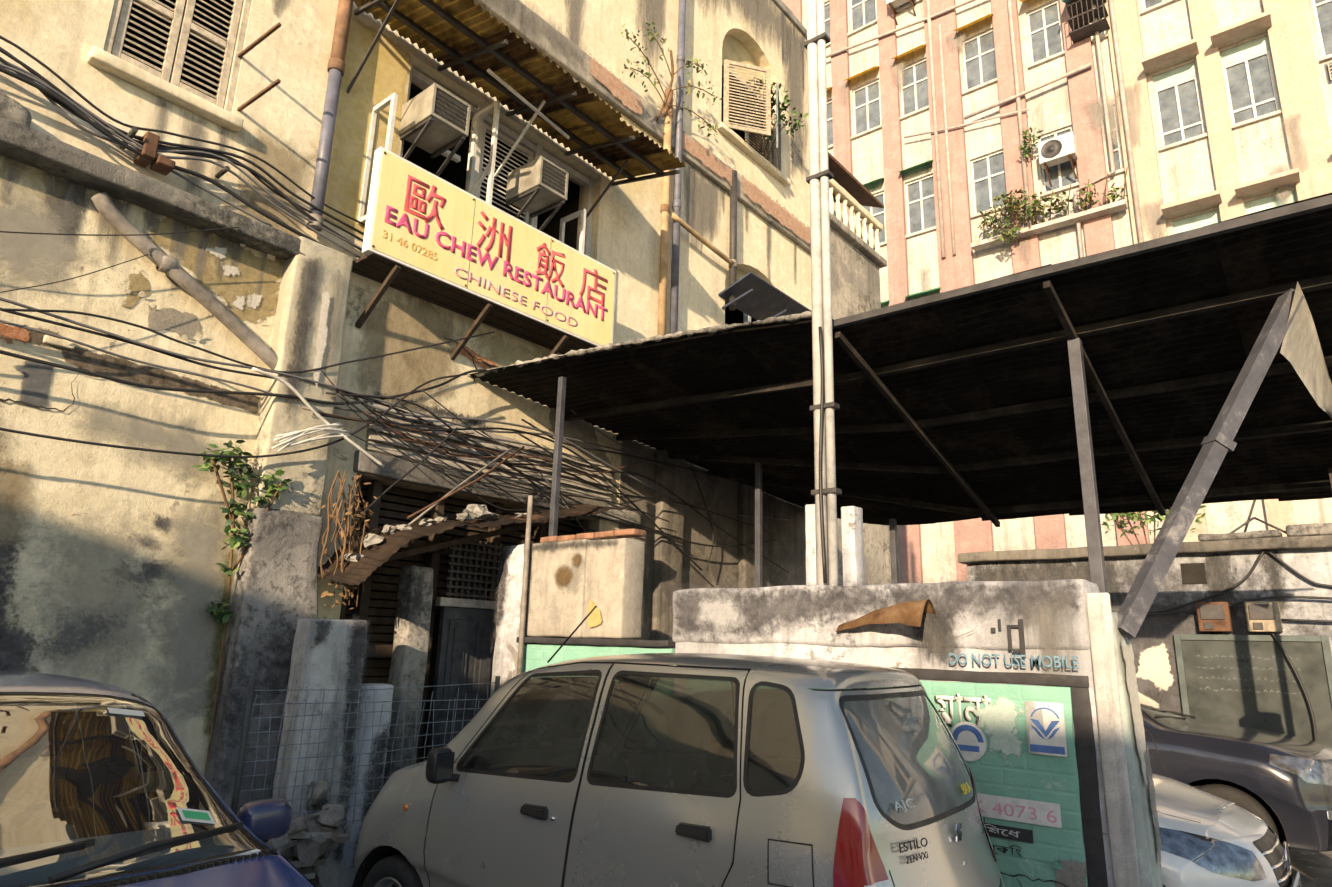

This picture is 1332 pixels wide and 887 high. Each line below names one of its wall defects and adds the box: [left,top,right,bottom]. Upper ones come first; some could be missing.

spalling [0,322,260,414]
peeling [122,272,203,341]
peeling [143,212,284,323]
damp [285,258,321,419]
damp [0,435,127,672]
damp [673,558,1120,670]
peeling [969,697,1026,765]
spalling [1050,860,1088,887]